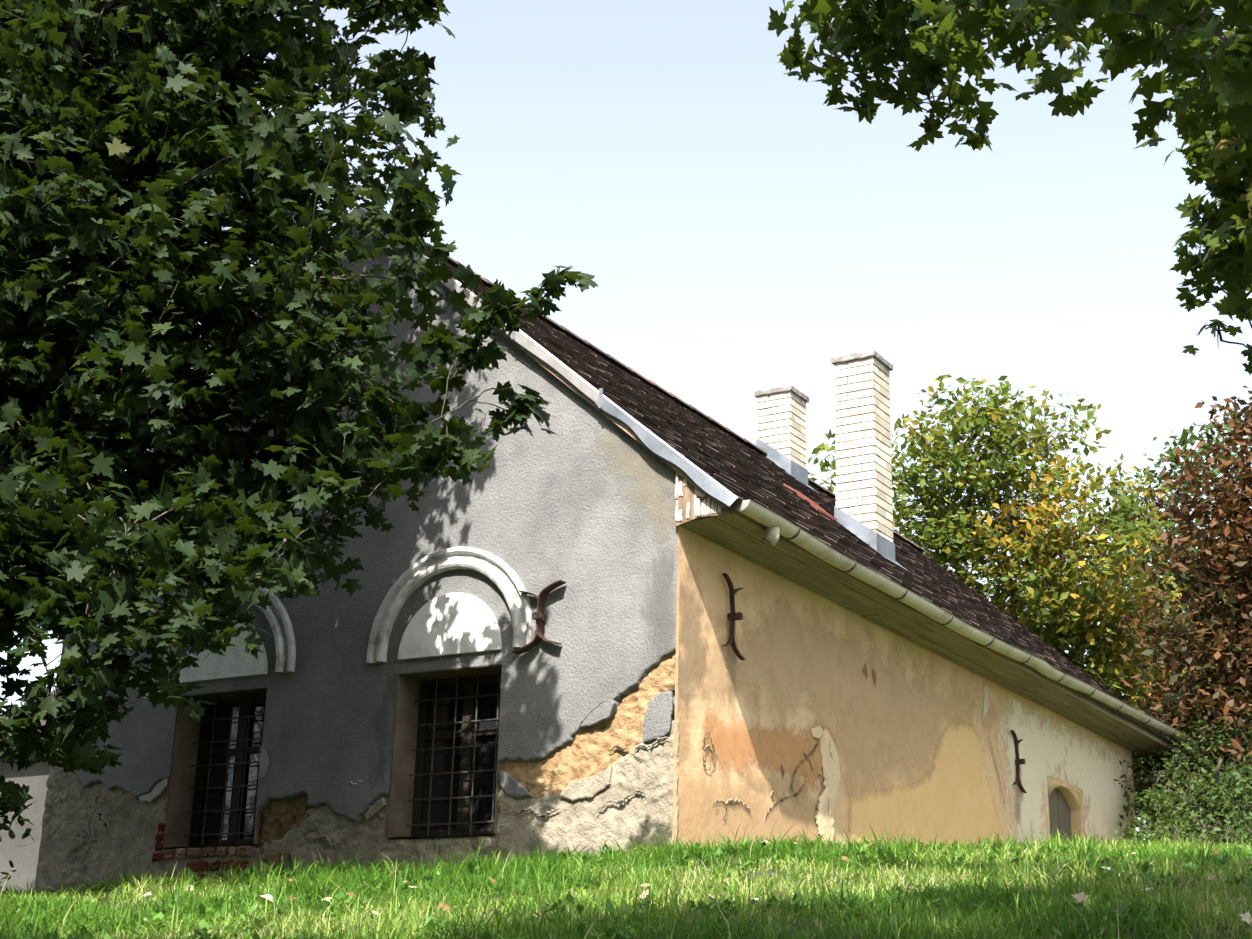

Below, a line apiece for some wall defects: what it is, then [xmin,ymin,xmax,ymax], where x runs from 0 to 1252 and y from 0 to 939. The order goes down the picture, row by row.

flaking render [35,648,680,894]
crack [702,730,824,828]
leakage [678,583,1133,845]